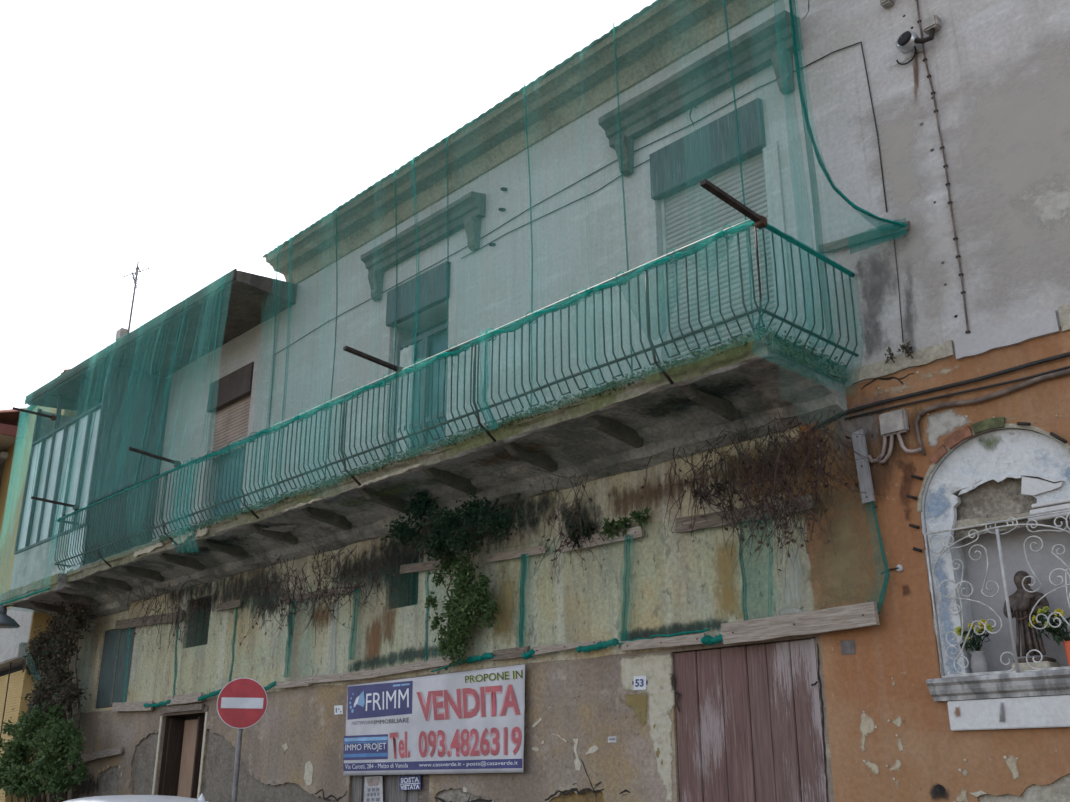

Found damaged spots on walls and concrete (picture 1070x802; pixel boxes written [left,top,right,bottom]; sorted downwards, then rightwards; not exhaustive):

water stain [857,260,895,354]
water stain [905,262,914,352]
flaking render [926,468,1070,539]
corrosion [365,607,395,661]
peeling [935,559,961,673]
flaking render [95,729,158,796]
peeling [860,711,904,787]
flaking render [931,759,1070,802]
peeling [1003,755,1019,779]